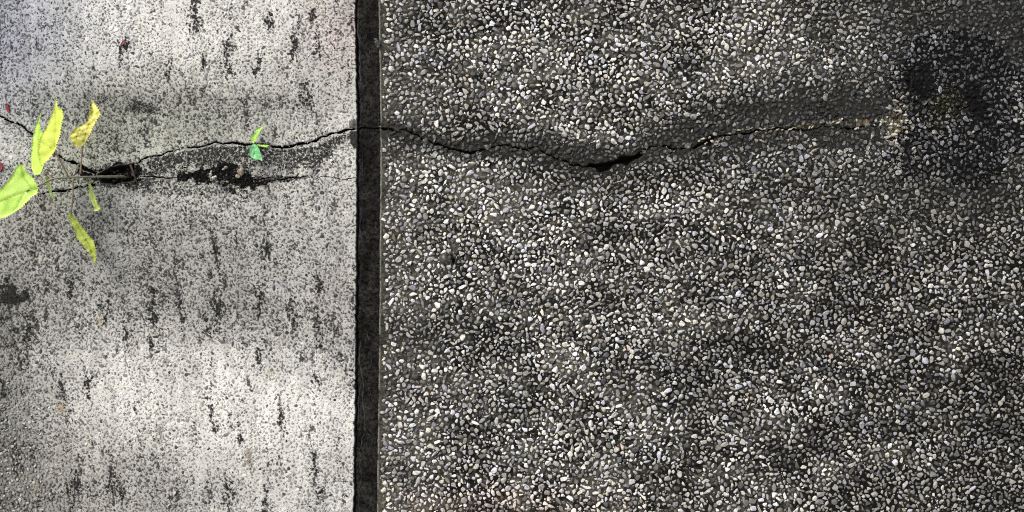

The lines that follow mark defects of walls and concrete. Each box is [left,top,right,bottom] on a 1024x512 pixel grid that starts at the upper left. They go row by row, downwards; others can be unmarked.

crack [0,114,34,136]
crack [39,152,100,197]
crack [134,126,585,182]
crack [639,144,690,154]
crack [717,125,877,138]
spalling [0,0,373,512]